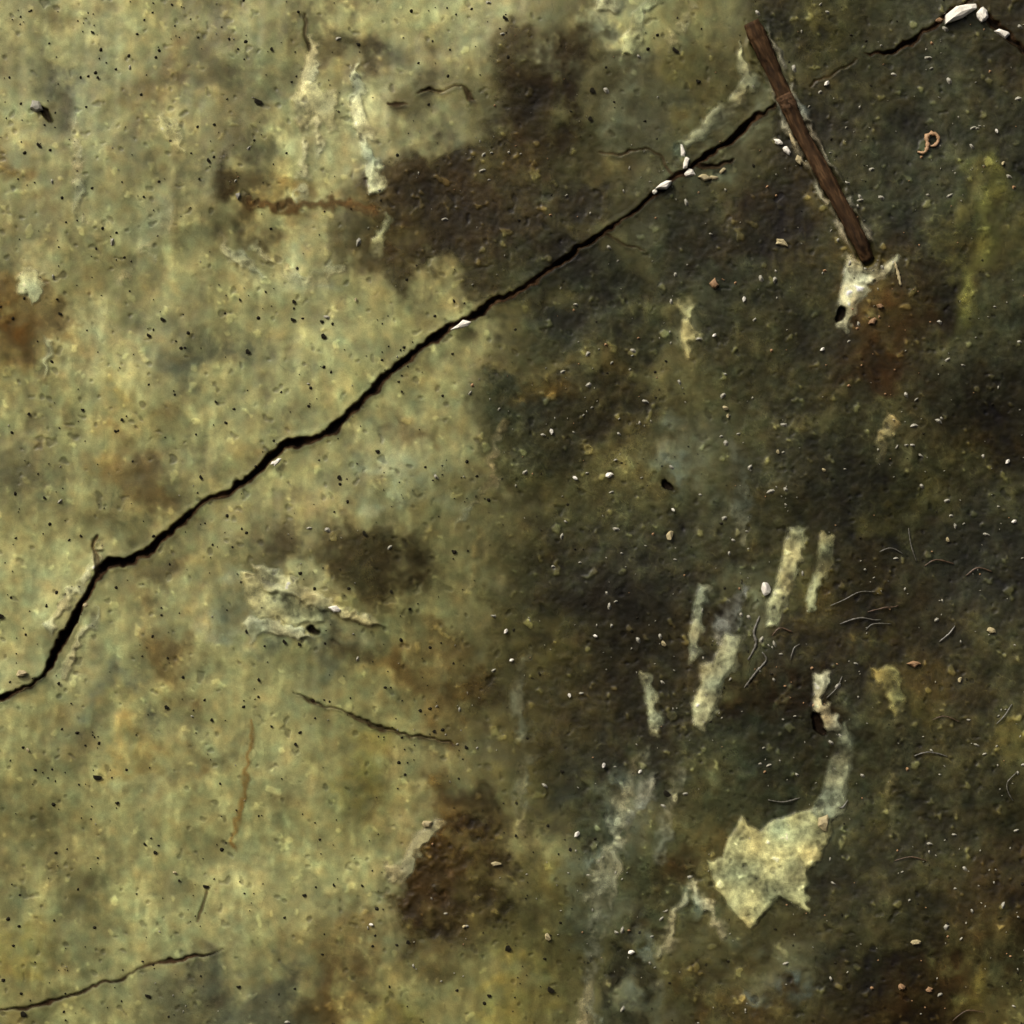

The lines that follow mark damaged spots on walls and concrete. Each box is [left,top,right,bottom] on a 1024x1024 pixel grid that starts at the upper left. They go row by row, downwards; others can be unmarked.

crack [302,14,310,51]
crack [866,0,1024,56]
crack [387,85,473,107]
leakage [196,123,238,200]
rust [247,195,377,214]
spalling [835,255,898,327]
crack [0,102,777,702]
leakage [336,0,1024,1024]
leakage [315,500,432,604]
spalling [241,567,375,639]
crack [293,692,453,745]
crack [0,952,215,1010]